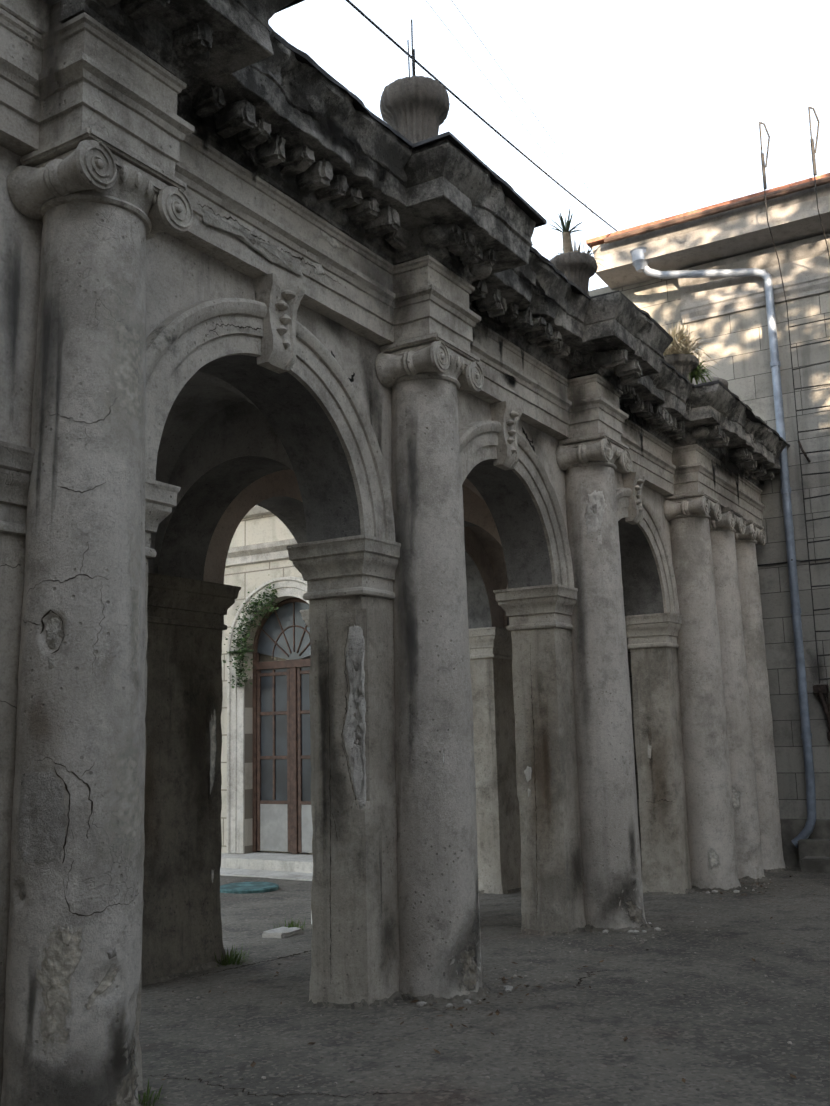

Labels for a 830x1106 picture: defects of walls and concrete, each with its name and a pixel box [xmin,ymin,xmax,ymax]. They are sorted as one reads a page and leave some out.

crack [199,204,340,284]
crack [207,316,261,337]
crack [48,397,118,451]
spalling [40,609,64,669]
crack [1,541,108,674]
spalling [341,621,366,808]
crack [35,757,95,838]
crack [63,861,139,916]